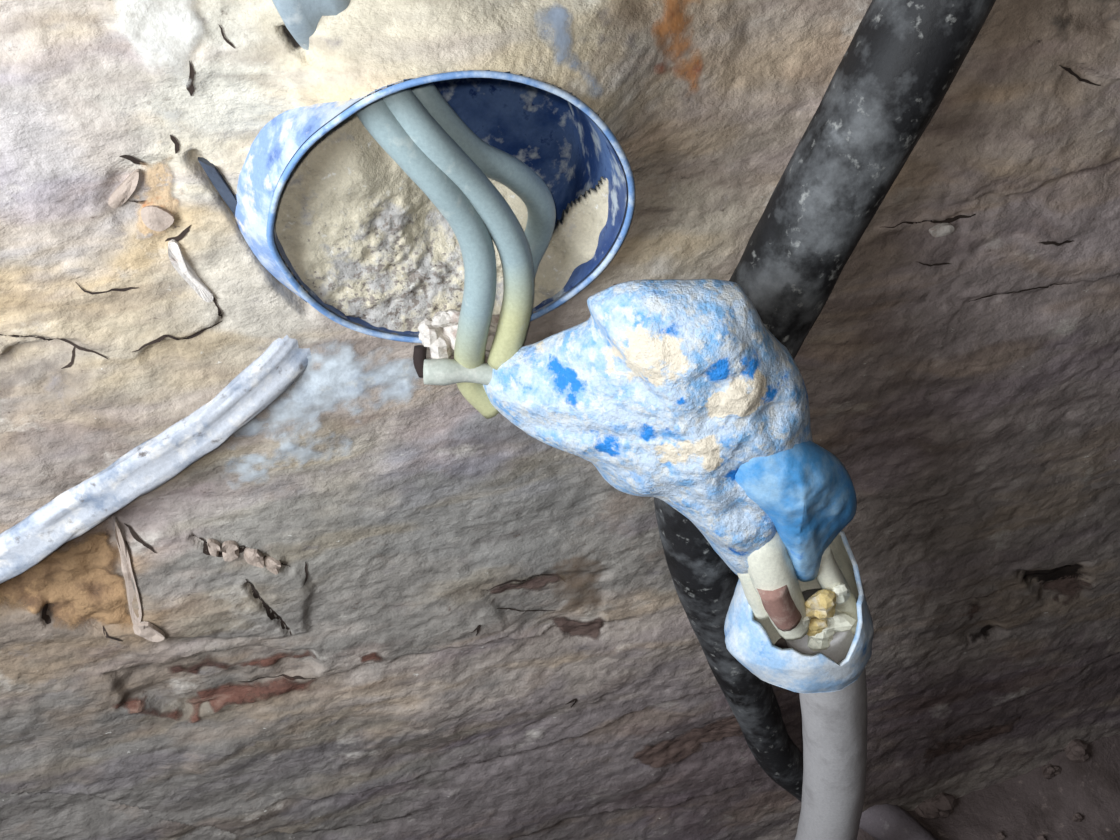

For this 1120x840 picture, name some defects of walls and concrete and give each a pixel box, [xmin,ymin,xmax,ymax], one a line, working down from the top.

rust [655,0,702,88]
flaking render [108,155,213,302]
crack [76,282,139,295]
crack [0,296,222,369]
flaking render [0,518,165,642]
flaking render [487,559,603,639]
flaking render [1023,564,1091,604]
flaking render [115,651,316,723]
flaking render [361,653,382,663]